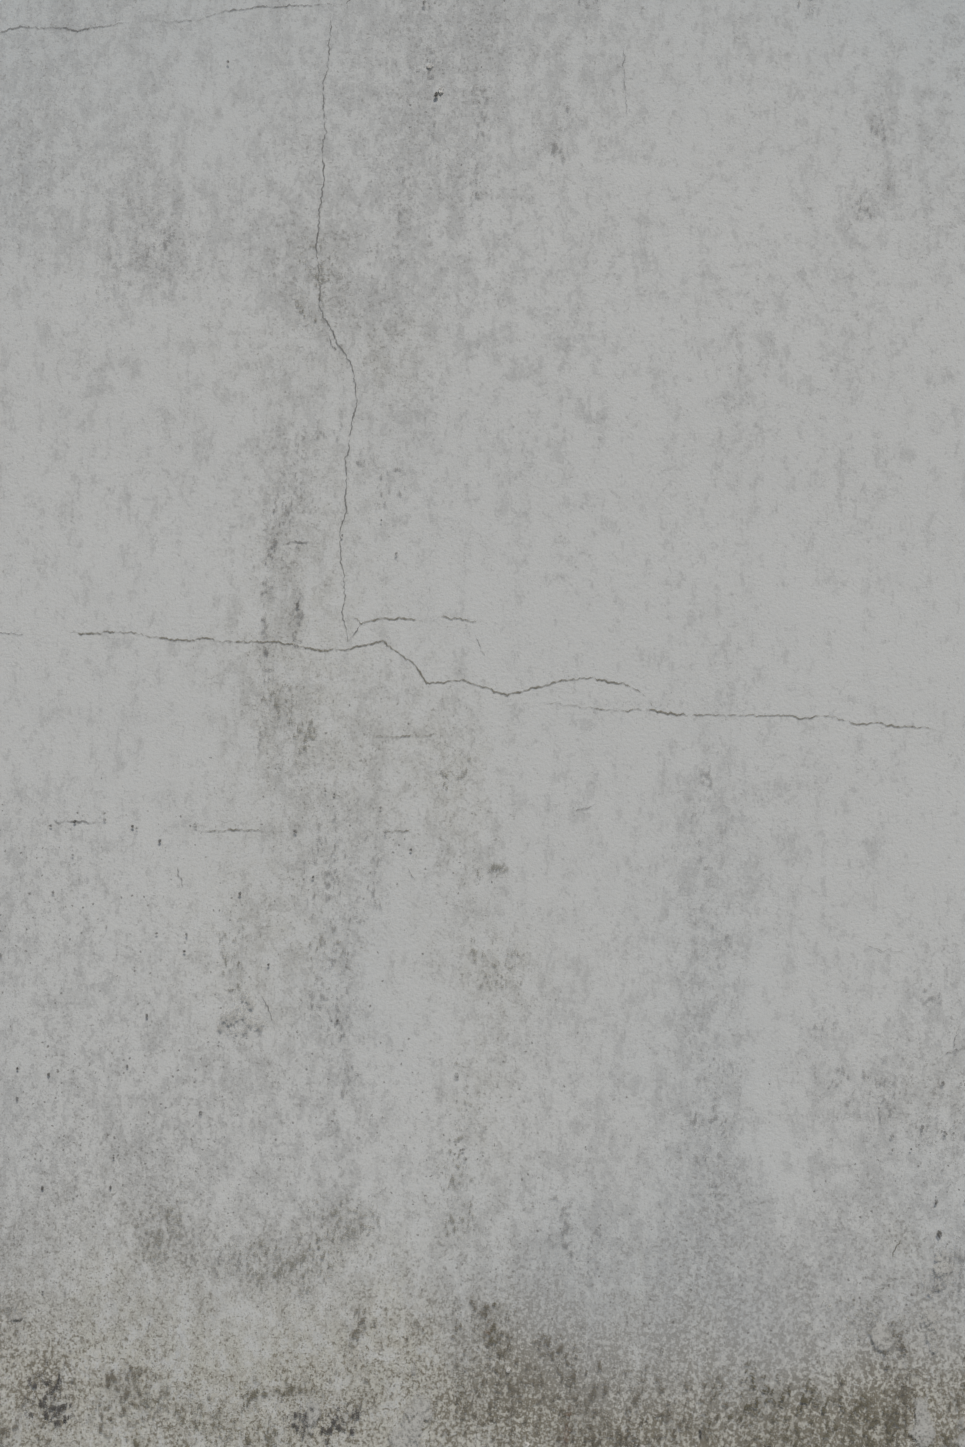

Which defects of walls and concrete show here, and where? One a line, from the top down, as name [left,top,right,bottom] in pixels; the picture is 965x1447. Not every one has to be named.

crack [1,23,118,32]
crack [73,0,928,728]
water stain [229,1201,377,1298]
mould [241,1375,362,1445]